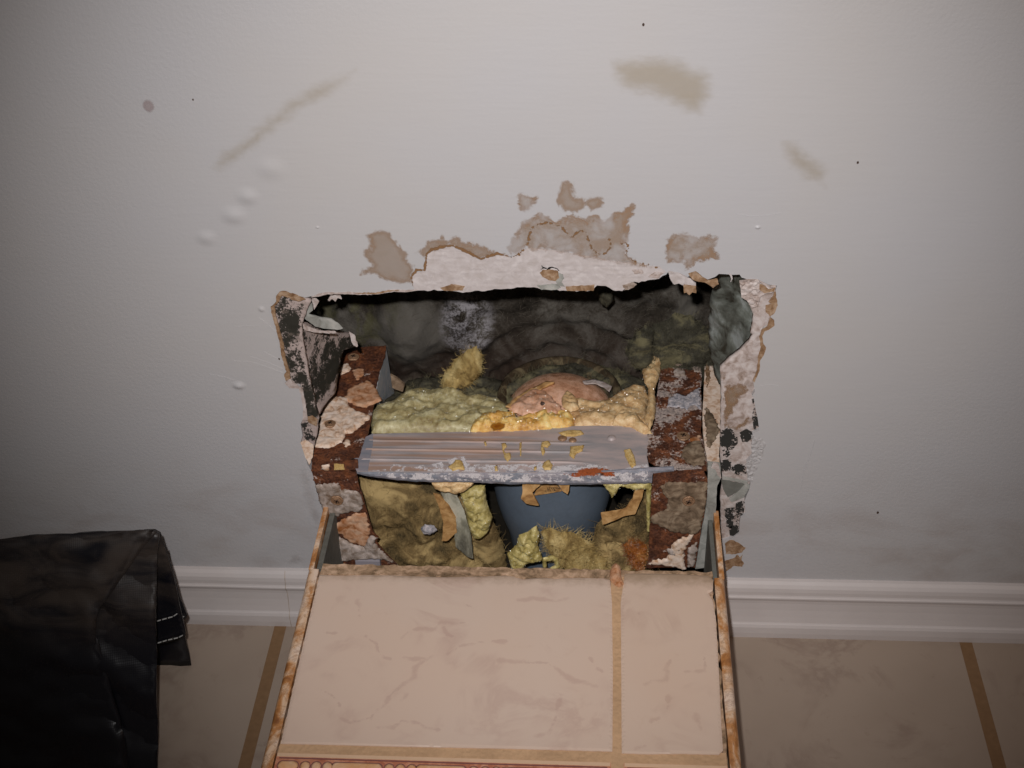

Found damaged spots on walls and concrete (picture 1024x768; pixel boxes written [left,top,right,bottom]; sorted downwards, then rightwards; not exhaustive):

peeling [412,246,719,295]
peeling [739,279,776,308]
peeling [289,293,358,347]
rust [667,388,701,410]
damp [720,399,759,475]
spalling [474,483,513,568]
spalling [605,487,634,512]
spalling [716,456,745,571]
damp [724,501,745,536]